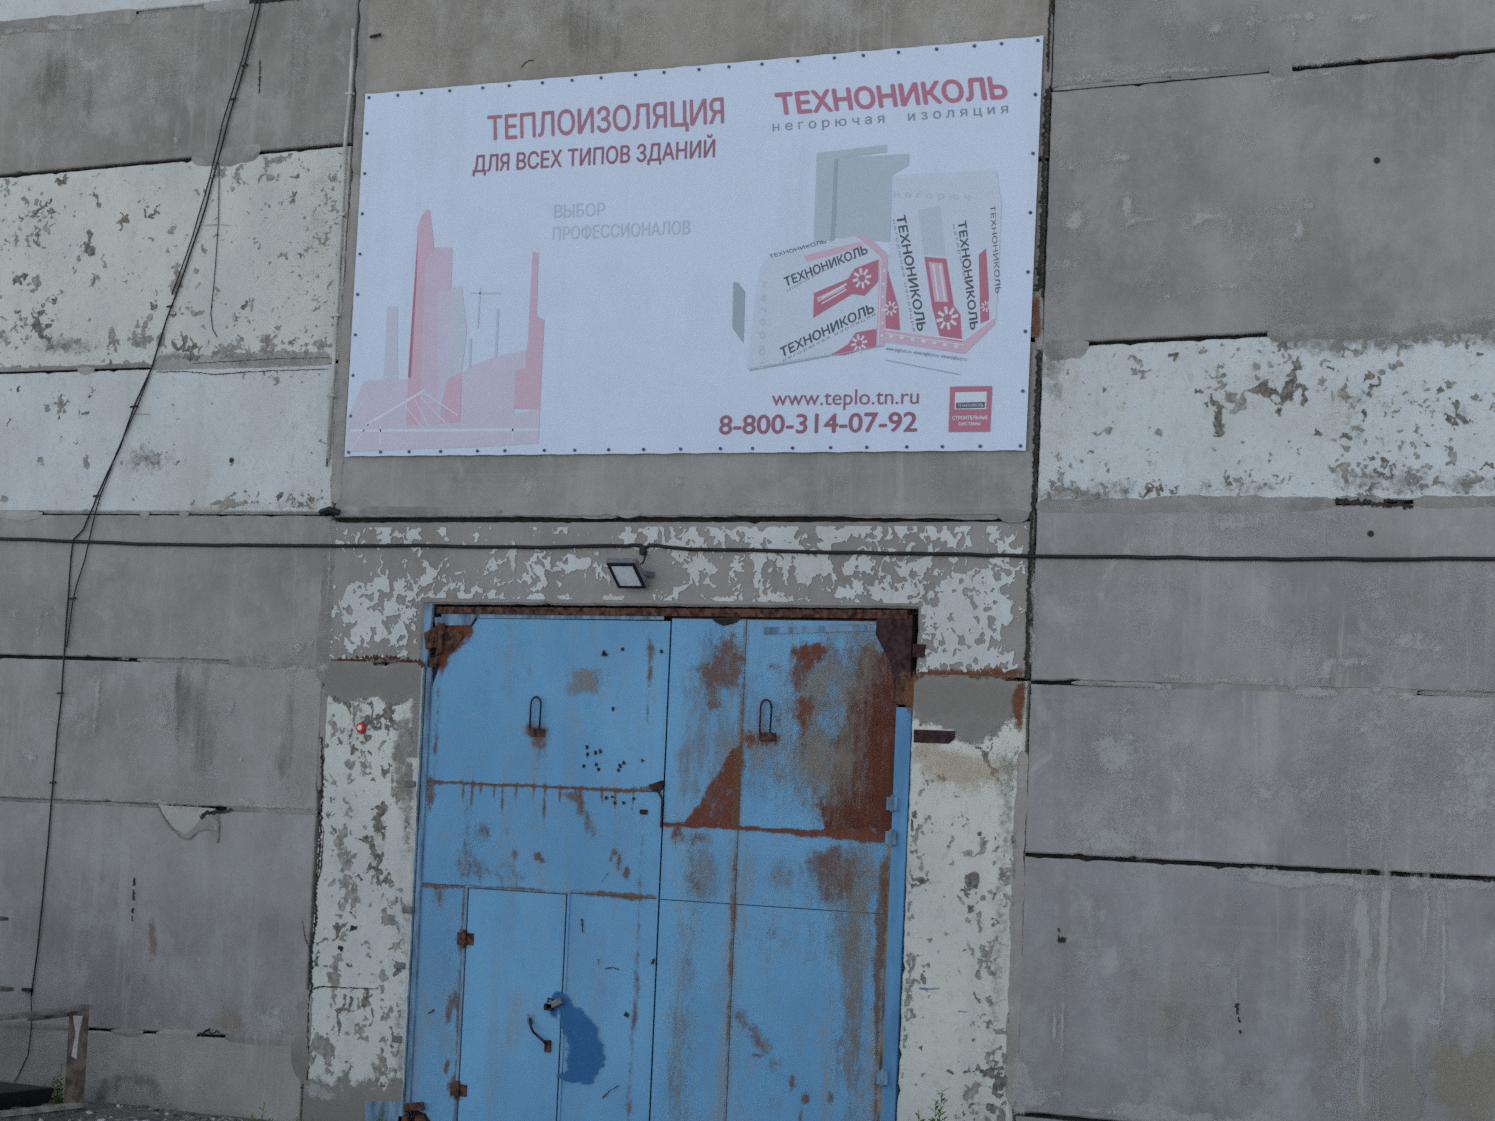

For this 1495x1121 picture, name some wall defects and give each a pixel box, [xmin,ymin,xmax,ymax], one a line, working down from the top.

peeling [0,152,342,385]
peeling [44,385,95,469]
peeling [1041,319,1495,502]
peeling [190,489,326,510]
rust [337,626,473,674]
spalling [158,803,232,843]
rust [423,851,538,951]
rust [427,778,652,828]
rust [580,890,653,900]
peeling [302,526,1027,1121]
rust [663,633,1027,1057]
rust [444,971,464,1089]